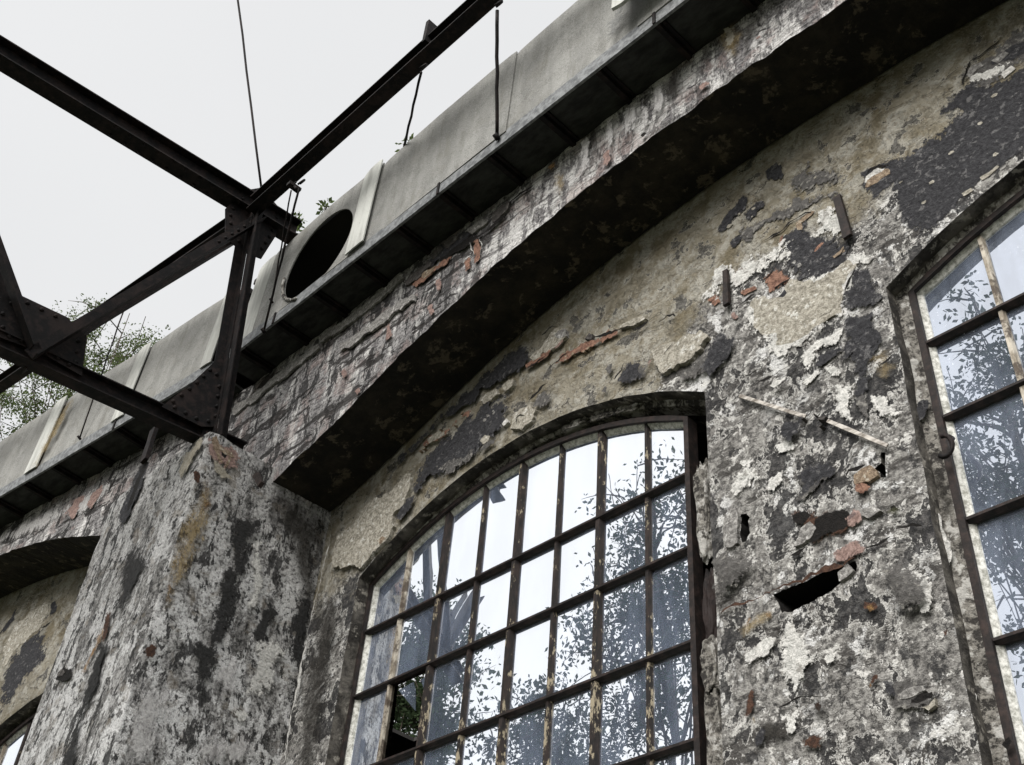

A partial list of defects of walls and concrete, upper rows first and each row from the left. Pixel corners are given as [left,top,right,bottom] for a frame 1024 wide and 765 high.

spalling [859,22,1024,241]
spalling [232,201,511,416]
spalling [718,161,885,309]
spalling [207,432,240,479]
spalling [791,452,922,562]
spalling [0,601,57,713]